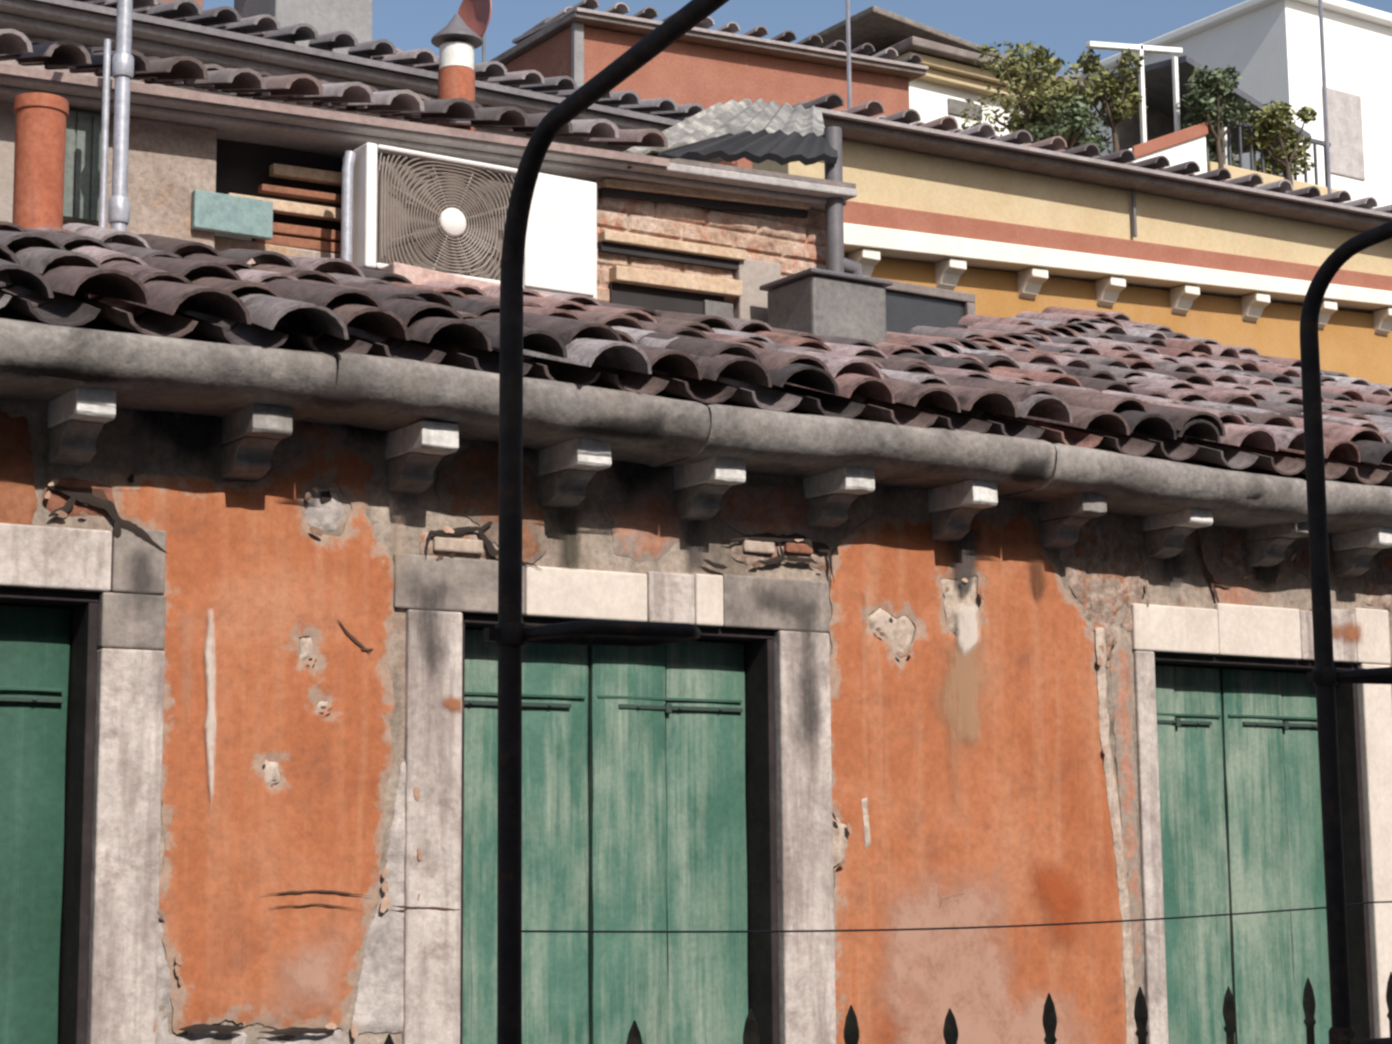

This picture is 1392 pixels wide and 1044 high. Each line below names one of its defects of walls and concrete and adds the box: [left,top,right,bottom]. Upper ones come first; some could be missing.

crack [46,474,167,553]
spalling [304,487,344,536]
spalling [419,526,498,561]
spalling [731,536,831,573]
peeling [941,577,984,635]
peeling [867,607,914,659]
spalling [1058,523,1149,1044]